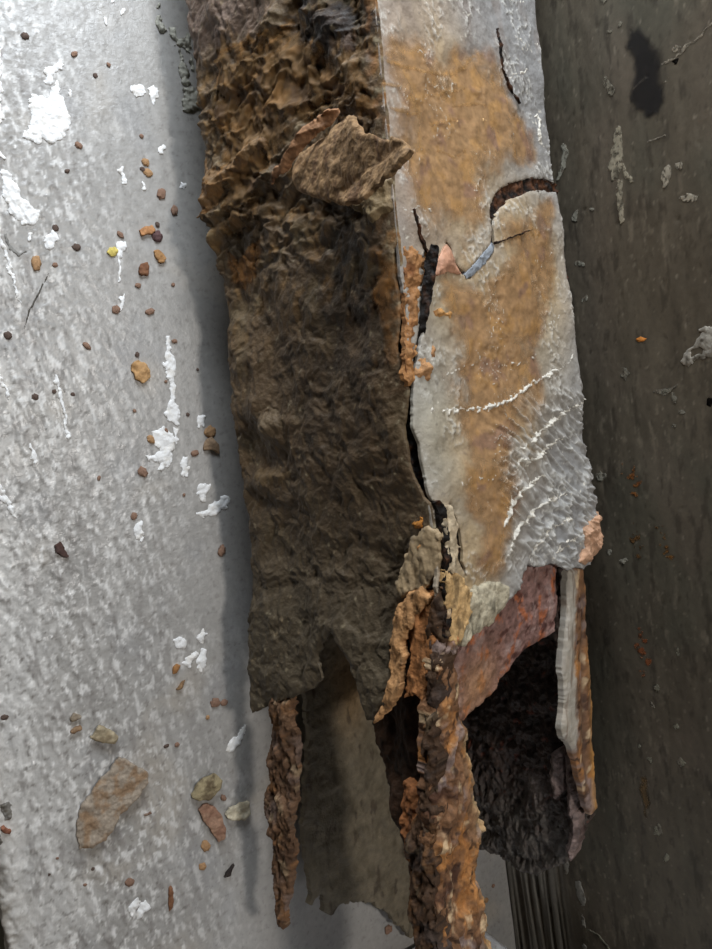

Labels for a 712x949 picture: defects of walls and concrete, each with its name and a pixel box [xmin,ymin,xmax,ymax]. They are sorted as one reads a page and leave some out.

leakage [628,32,661,114]
crack [491,230,530,244]
crack [490,177,559,218]
crack [395,208,439,362]
corrosion [448,205,551,566]
crack [406,386,463,639]
peeling [579,512,627,565]